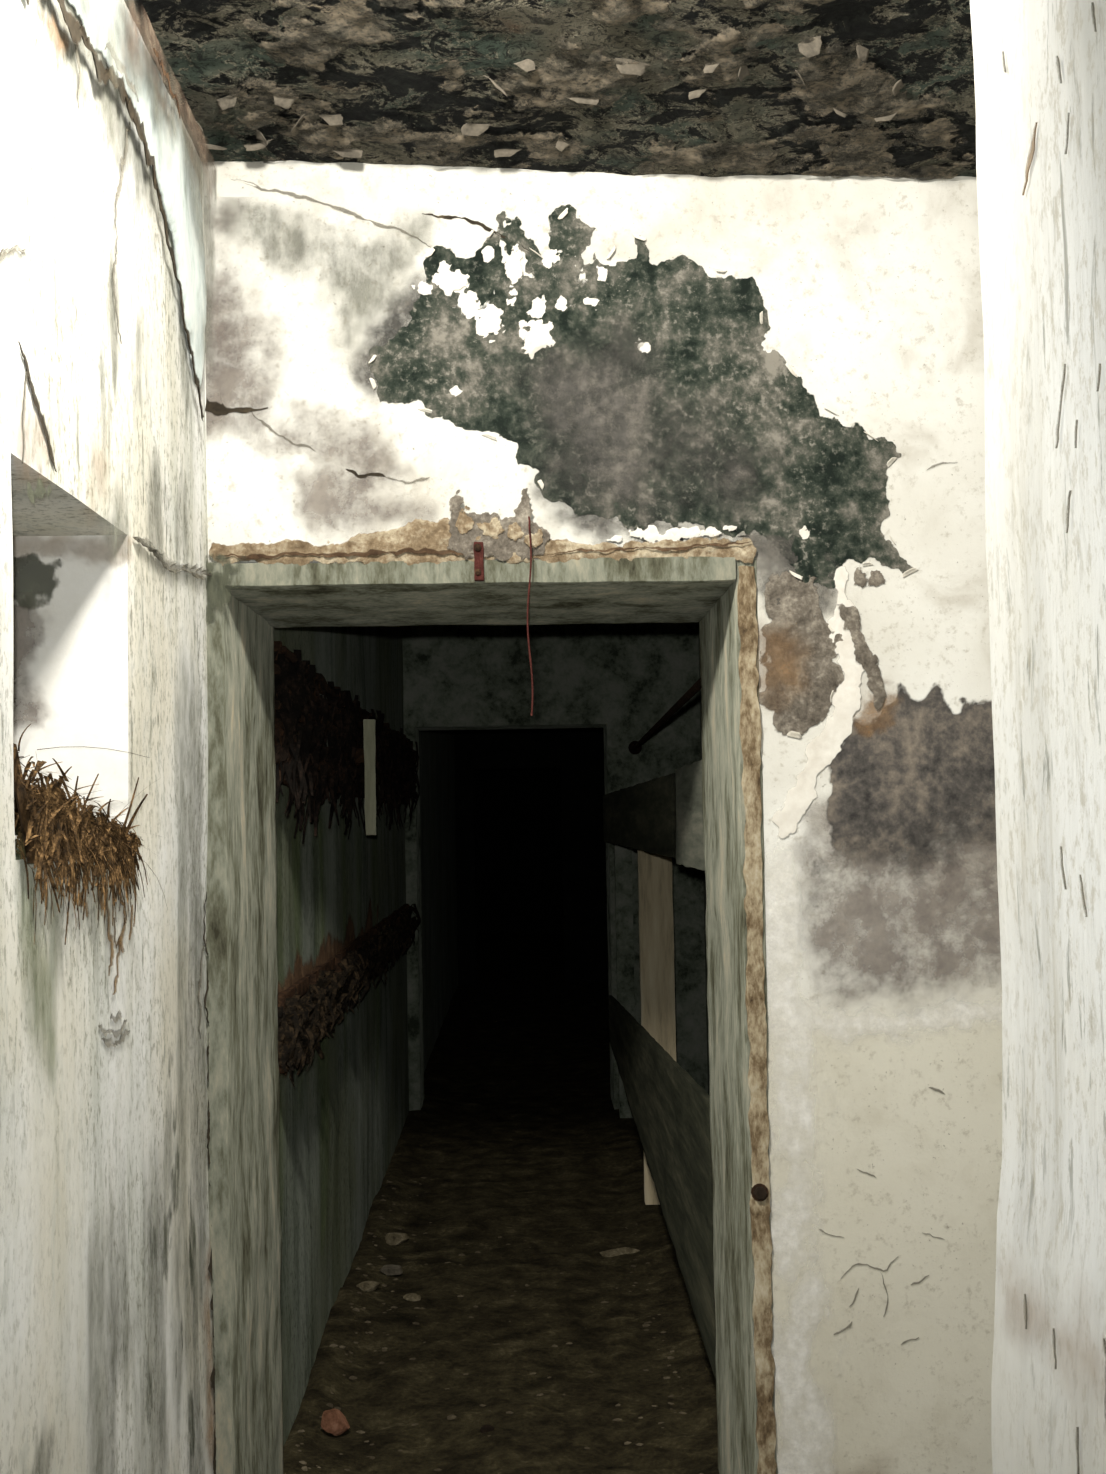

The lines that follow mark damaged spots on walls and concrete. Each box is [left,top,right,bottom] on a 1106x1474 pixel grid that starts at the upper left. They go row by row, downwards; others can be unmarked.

crack [26,0,315,451]
water stain [254,214,304,259]
water stain [335,248,402,315]
crack [231,179,529,251]
water stain [205,281,268,428]
water stain [153,467,162,546]
water stain [300,435,401,526]
crack [346,469,430,484]
peeling [209,204,919,838]
water stain [764,683,1002,1474]